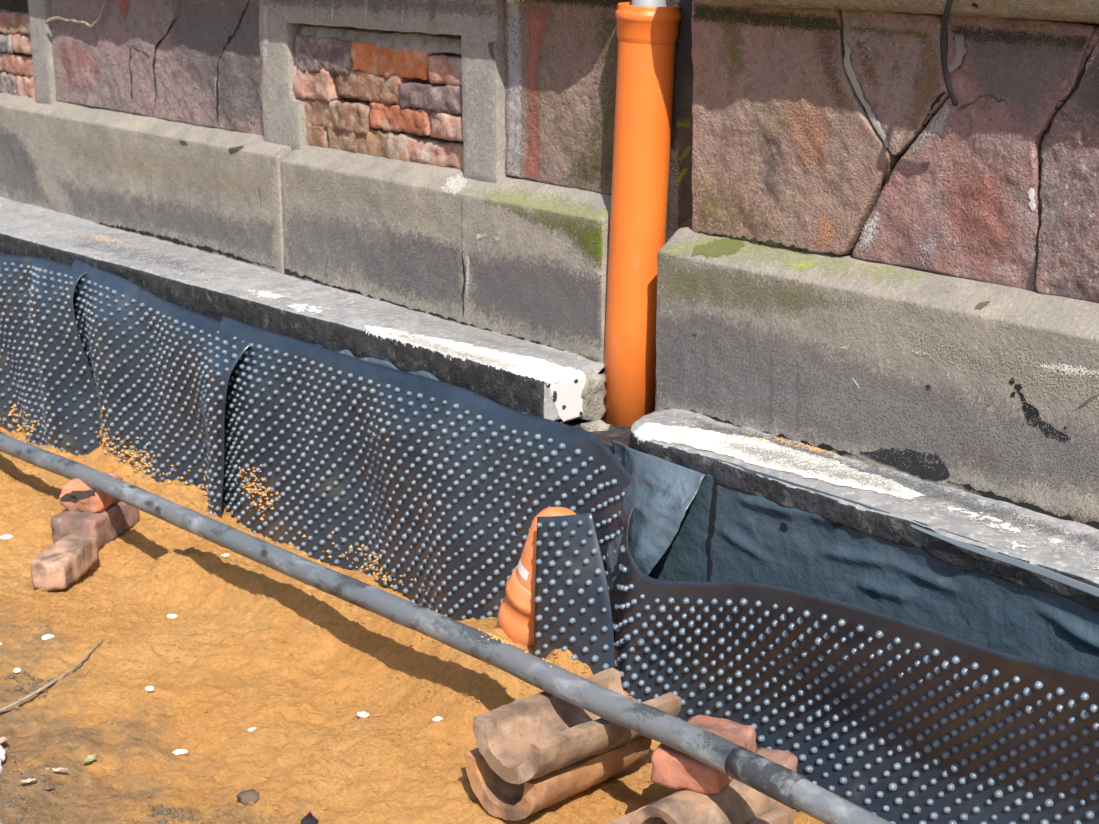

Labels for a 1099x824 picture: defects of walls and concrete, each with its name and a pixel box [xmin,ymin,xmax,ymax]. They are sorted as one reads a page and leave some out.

crack [129,1,181,104]
crack [216,0,249,122]
water stain [0,121,603,369]
crack [852,92,1007,251]
crack [1035,40,1099,292]
water stain [655,256,1099,565]
crack [947,481,1099,530]